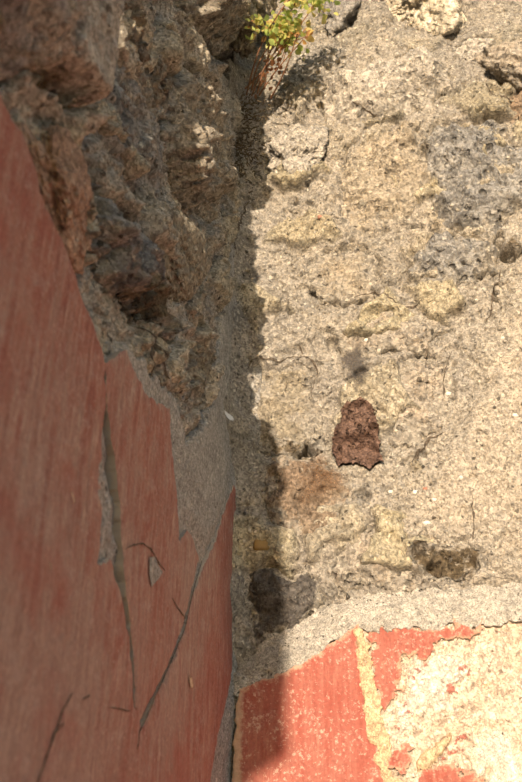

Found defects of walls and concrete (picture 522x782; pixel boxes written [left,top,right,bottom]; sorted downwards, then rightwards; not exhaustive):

crack [126,543,165,571]
crack [109,561,202,749]
crack [37,692,91,782]
spalling [388,652,474,776]
peeling [418,734,486,782]